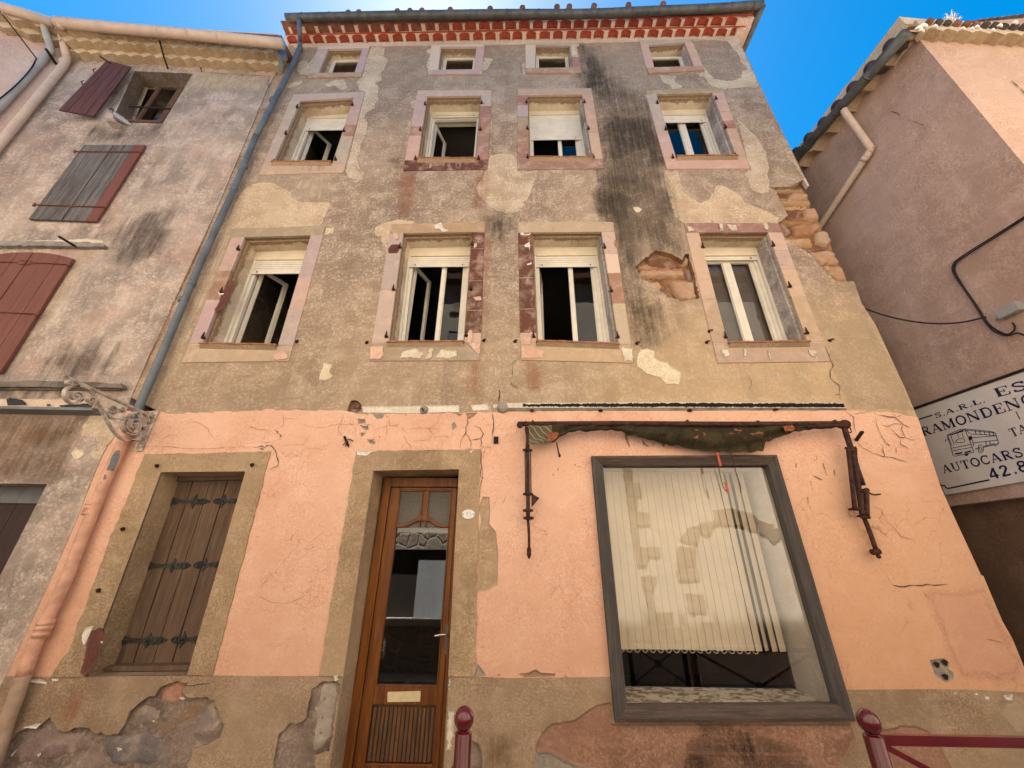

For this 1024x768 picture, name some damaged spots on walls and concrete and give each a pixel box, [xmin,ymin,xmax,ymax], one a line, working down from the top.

peeling [476,153,537,214]
water stain [587,61,671,260]
peeling [663,119,847,282]
flaking render [636,254,697,301]
crack [154,360,538,497]
peeling [621,347,681,384]
crack [826,349,910,462]
peeling [80,626,105,676]
flaking render [1,681,224,768]
flaking render [275,675,340,768]
peeling [535,702,856,768]